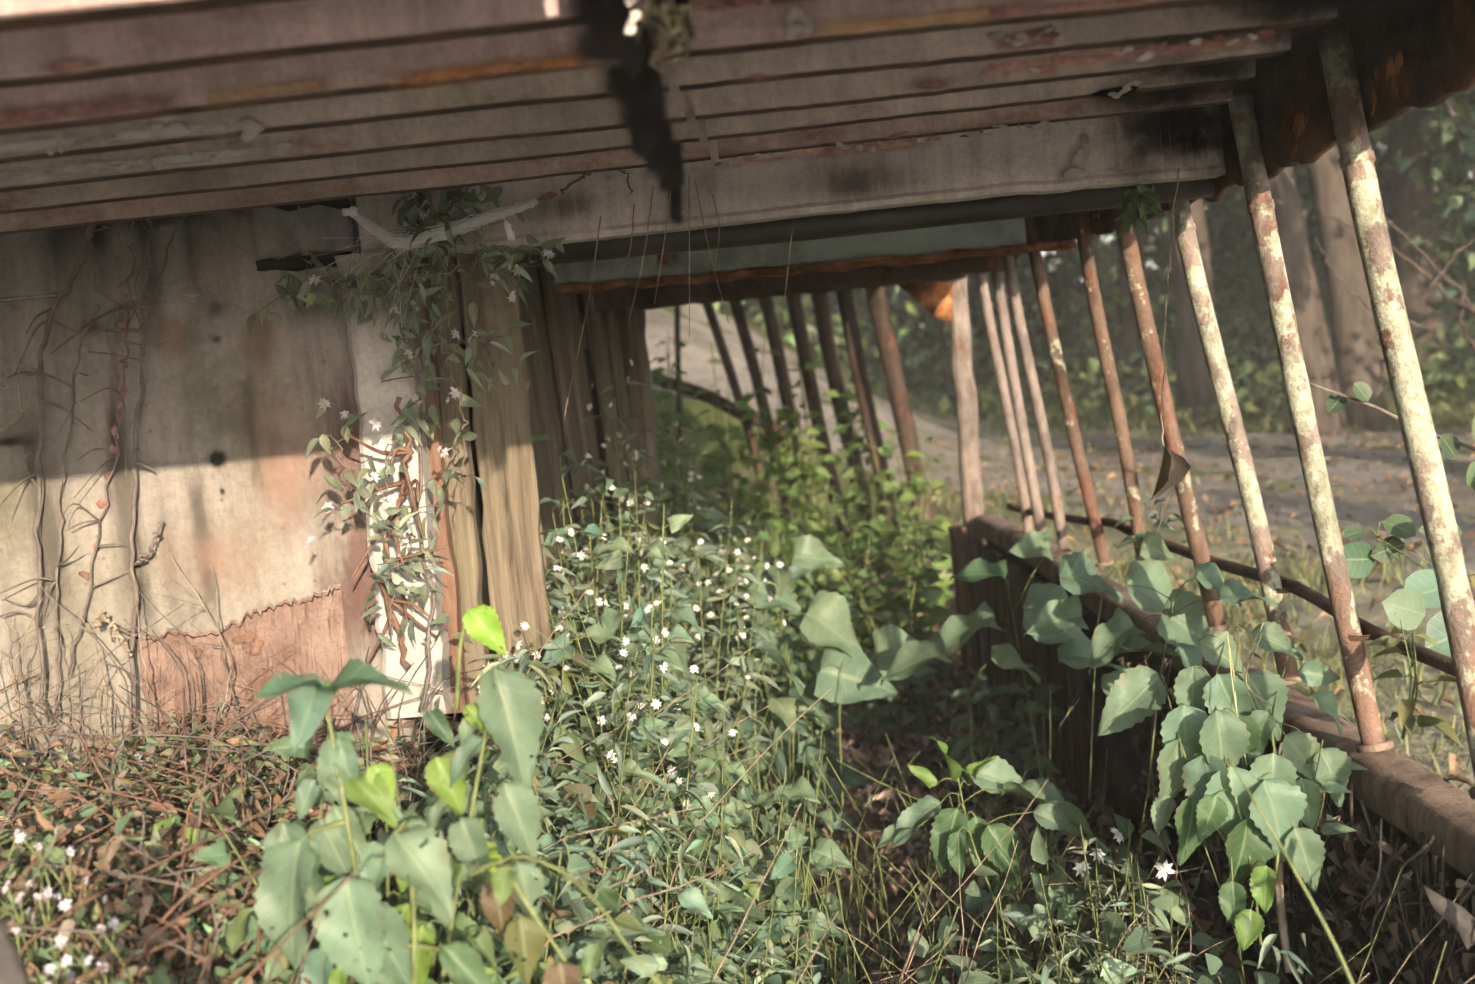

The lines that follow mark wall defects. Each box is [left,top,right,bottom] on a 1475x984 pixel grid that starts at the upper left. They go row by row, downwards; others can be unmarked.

leakage [0,427,61,593]
leakage [111,435,147,606]
leakage [194,496,210,587]
spalling [136,584,360,769]